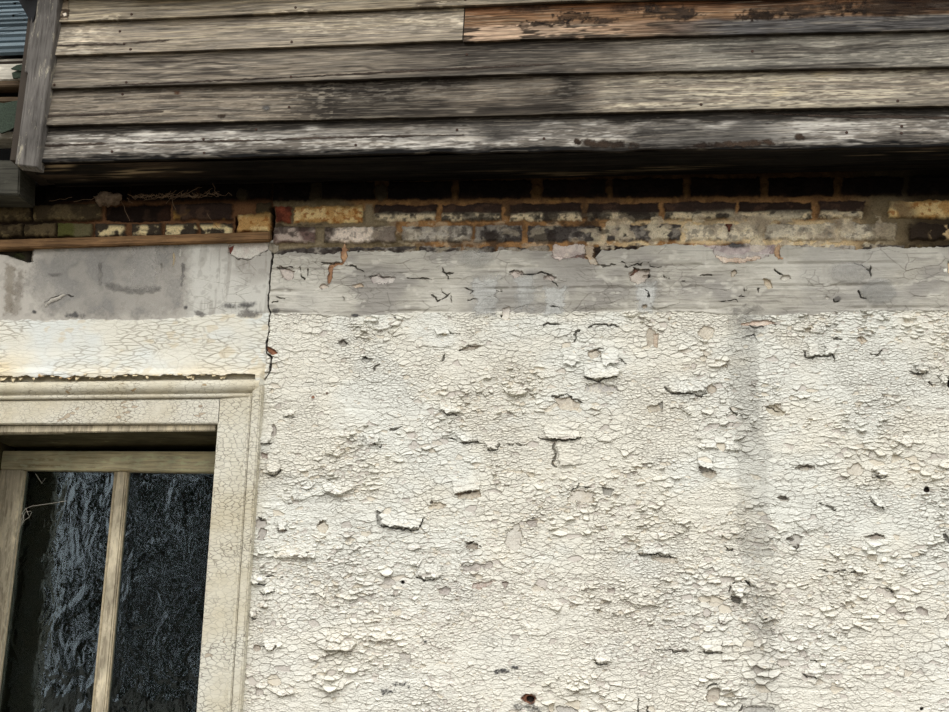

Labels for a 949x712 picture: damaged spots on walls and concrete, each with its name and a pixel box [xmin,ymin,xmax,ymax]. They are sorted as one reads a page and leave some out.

flaking render [0,169,949,281]
crack [265,243,279,380]
peeling [562,349,621,383]
peeling [668,379,717,397]
peeling [260,418,281,476]
peeling [543,423,583,466]
peeling [697,452,717,479]
peeling [451,479,481,499]
peeling [377,502,446,531]
peeling [641,544,678,564]
peeling [462,561,508,589]
peeling [730,578,765,604]